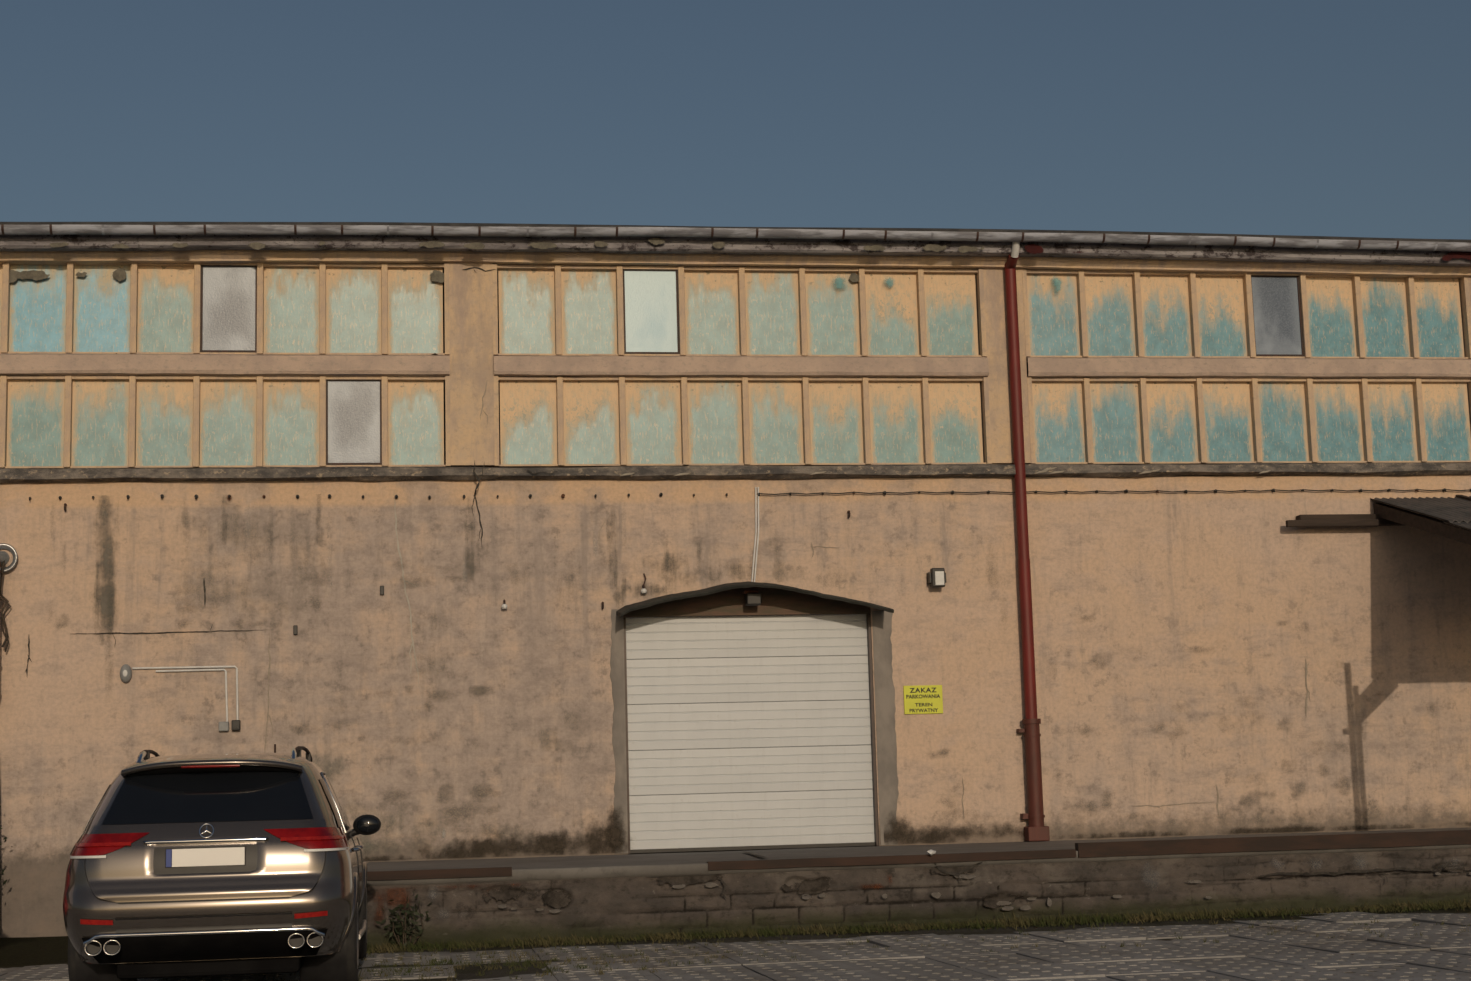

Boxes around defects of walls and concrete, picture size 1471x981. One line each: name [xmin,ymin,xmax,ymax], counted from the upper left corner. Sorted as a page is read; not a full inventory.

crack [472,462,484,544]
damp [94,500,115,631]
damp [420,808,623,859]